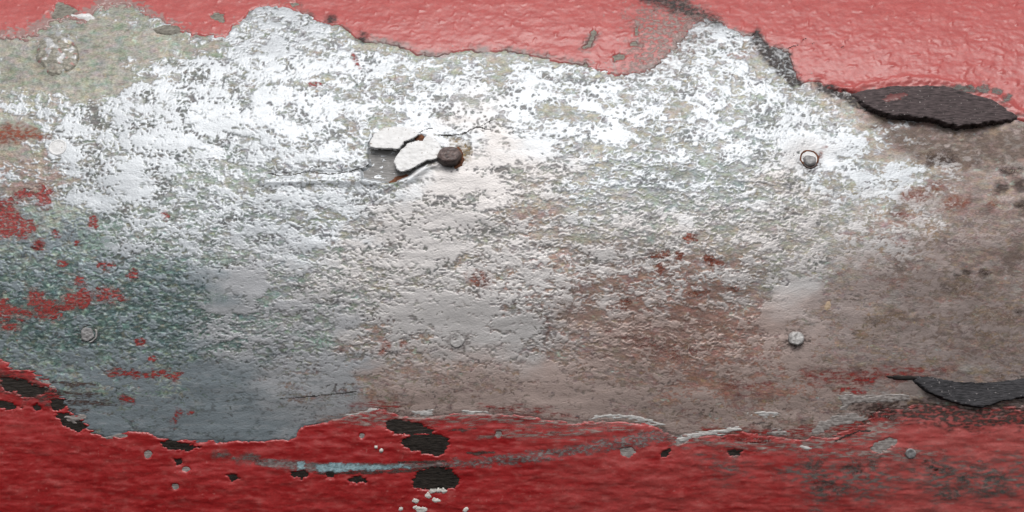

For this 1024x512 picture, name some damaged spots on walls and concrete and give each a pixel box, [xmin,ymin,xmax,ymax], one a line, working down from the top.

peeling [0,378,48,397]
peeling [0,400,23,410]
peeling [386,419,435,437]
peeling [495,424,602,439]
peeling [577,417,641,425]
peeling [851,416,907,445]
peeling [401,431,450,456]
peeling [817,437,909,462]
peeling [256,459,328,480]
peeling [341,462,459,490]